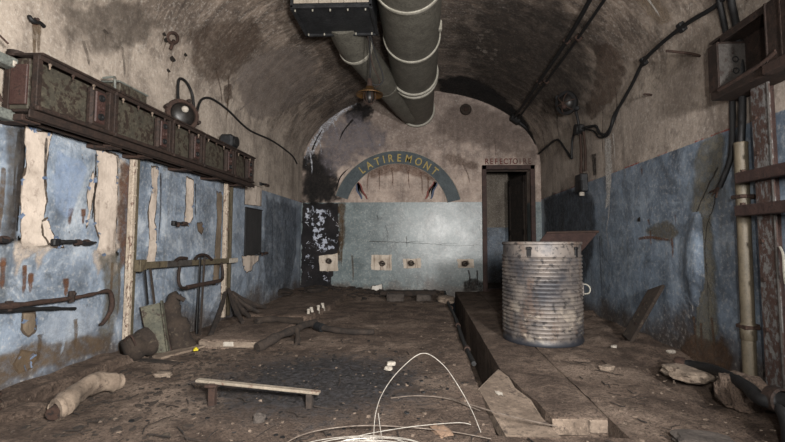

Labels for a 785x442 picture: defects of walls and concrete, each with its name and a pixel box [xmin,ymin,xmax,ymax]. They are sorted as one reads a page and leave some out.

peeling [9,124,64,271]
peeling [85,150,127,276]
peeling [146,165,162,262]
peeling [184,176,205,235]